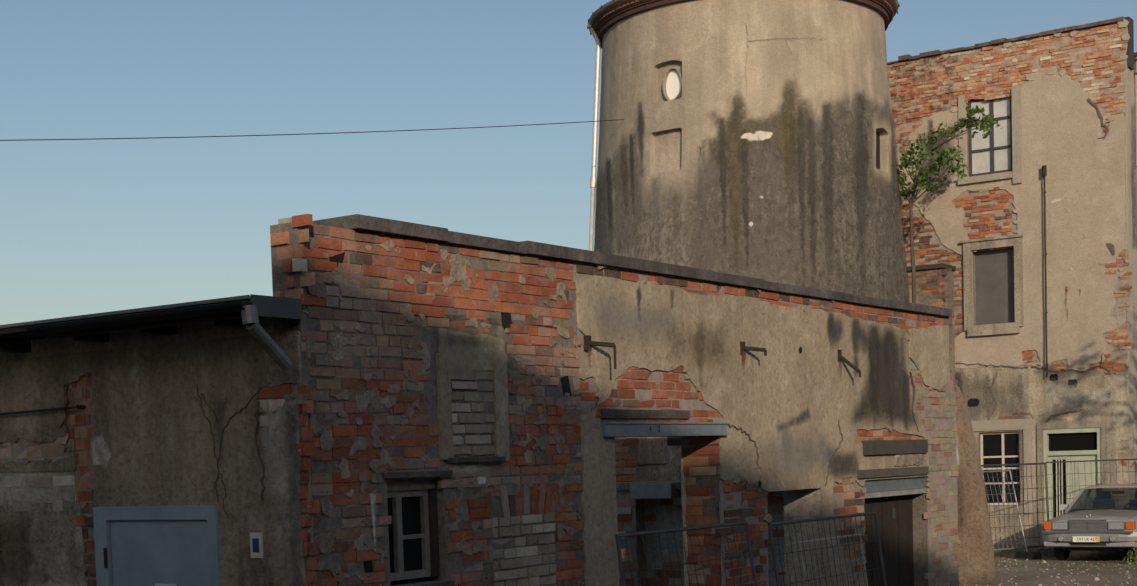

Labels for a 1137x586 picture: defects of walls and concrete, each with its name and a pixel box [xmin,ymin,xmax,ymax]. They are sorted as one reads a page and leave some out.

flaking render [887,19,1130,161]
leakage [594,84,910,303]
flaking render [0,372,97,586]
crack [196,384,280,518]
crack [728,424,759,466]
flaking render [560,185,1020,586]
leakage [829,314,914,425]
flaking render [1019,250,1132,388]